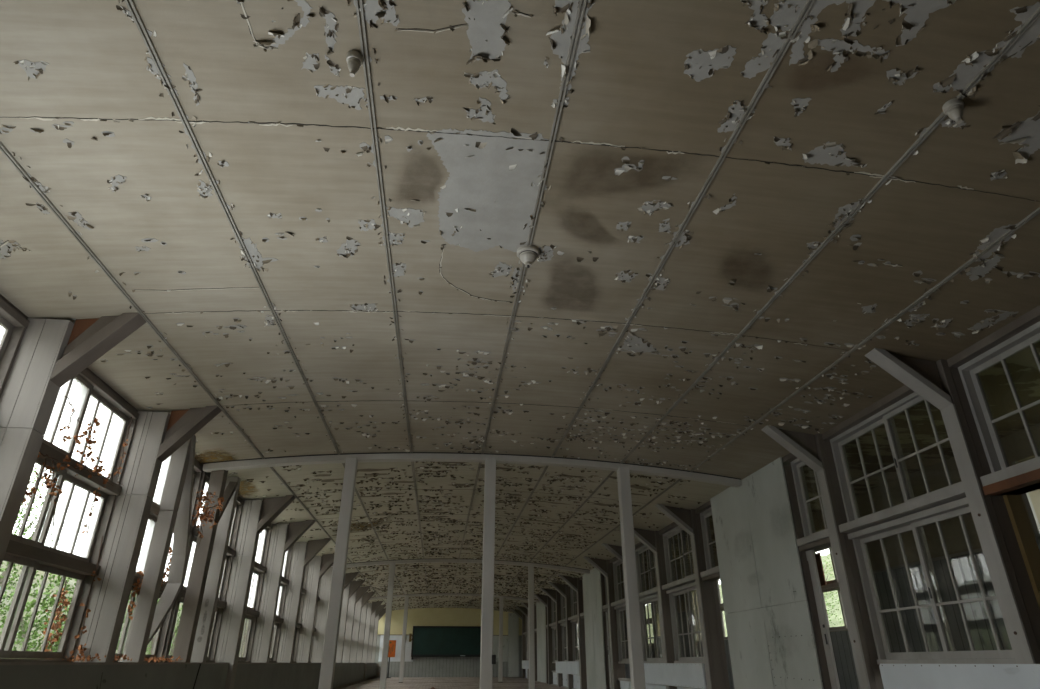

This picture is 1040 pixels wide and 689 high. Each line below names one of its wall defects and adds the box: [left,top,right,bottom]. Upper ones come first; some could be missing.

peeling [14,59,49,81]
peeling [684,0,956,86]
peeling [933,2,1040,98]
peeling [30,121,74,148]
peeling [144,51,229,198]
peeling [316,0,564,303]
peeling [614,156,645,176]
peeling [990,105,1040,181]
peeling [230,231,294,272]
crack [132,244,844,350]